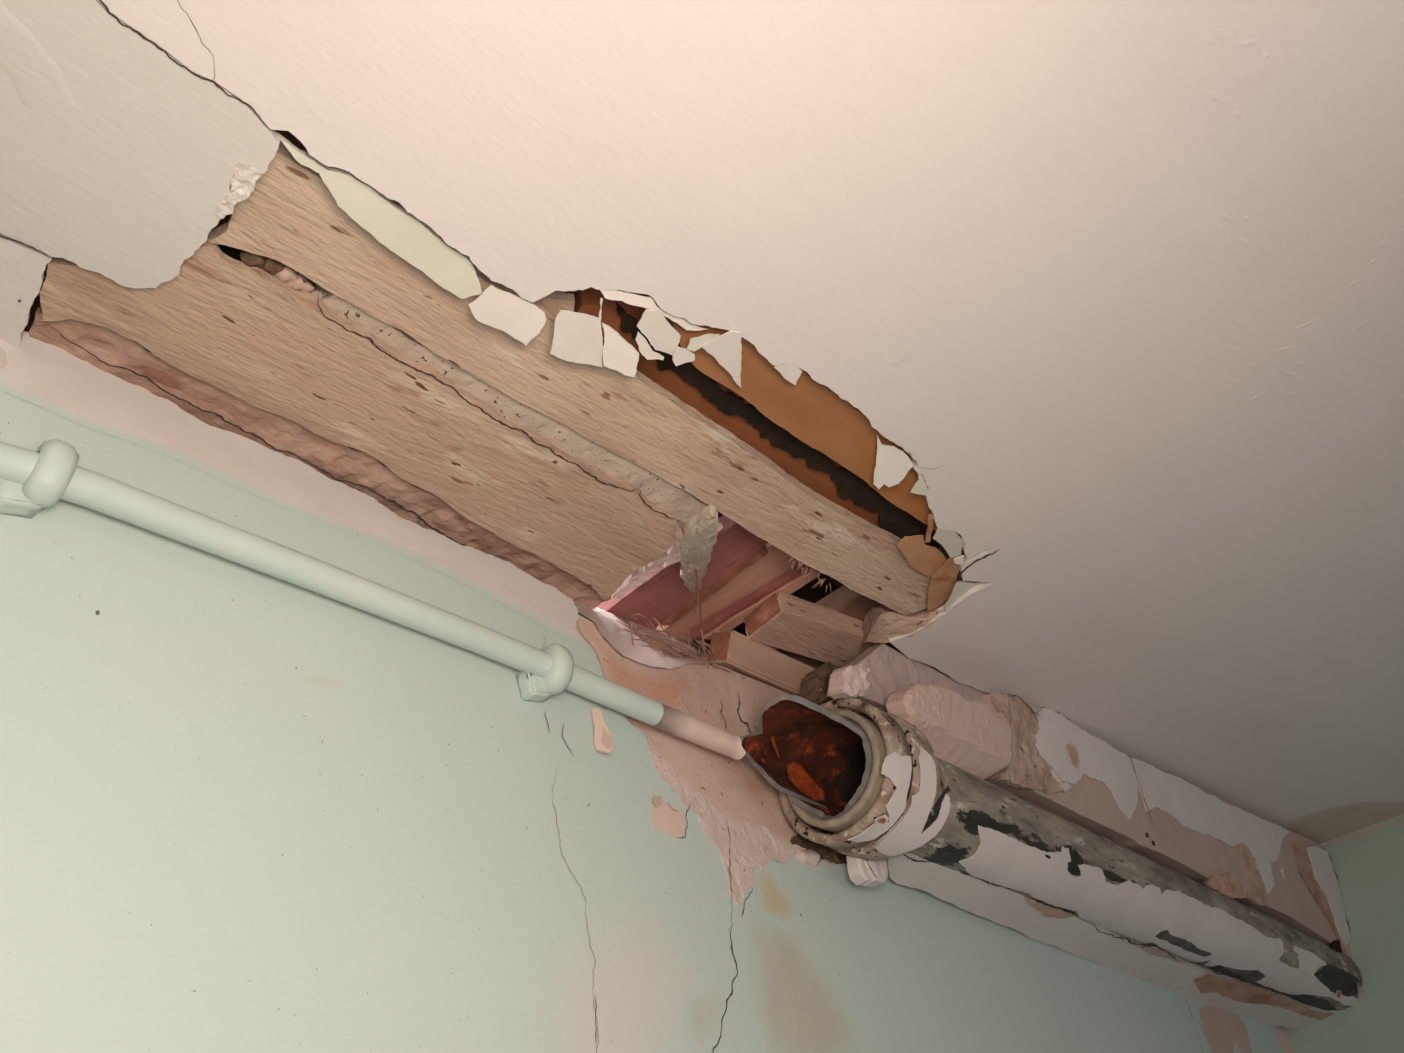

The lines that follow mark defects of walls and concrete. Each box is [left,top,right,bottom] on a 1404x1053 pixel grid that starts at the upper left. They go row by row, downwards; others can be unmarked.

crack [99,0,266,126]
crack [0,235,51,259]
spalling [215,161,261,219]
peeling [469,285,742,387]
peeling [873,435,928,496]
crack [545,713,599,1053]
water stain [515,866,863,1053]
spalling [646,738,806,906]
crack [713,822,753,1053]
corrosion [769,734,848,807]
peeling [1045,845,1149,888]
peeling [1142,930,1336,1053]